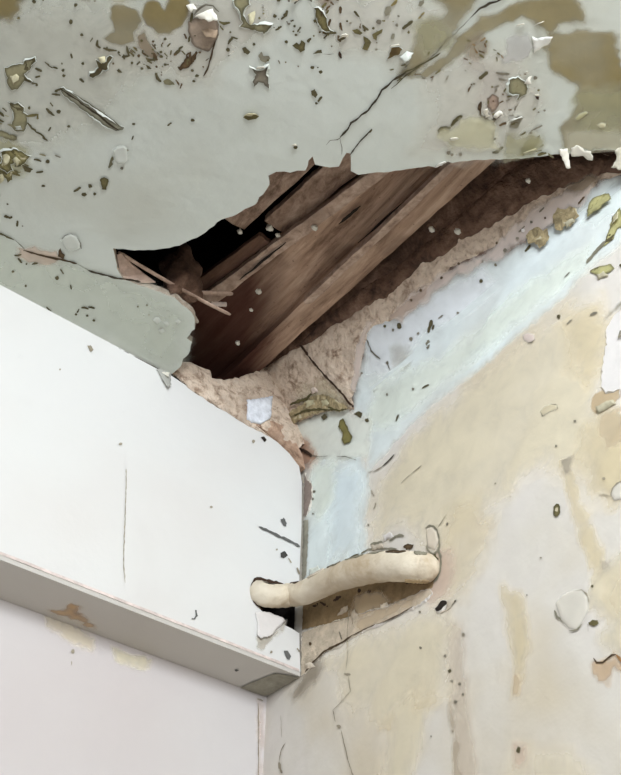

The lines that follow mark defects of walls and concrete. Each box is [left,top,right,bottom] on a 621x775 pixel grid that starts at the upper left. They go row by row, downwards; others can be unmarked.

spalling [157,71,621,448]